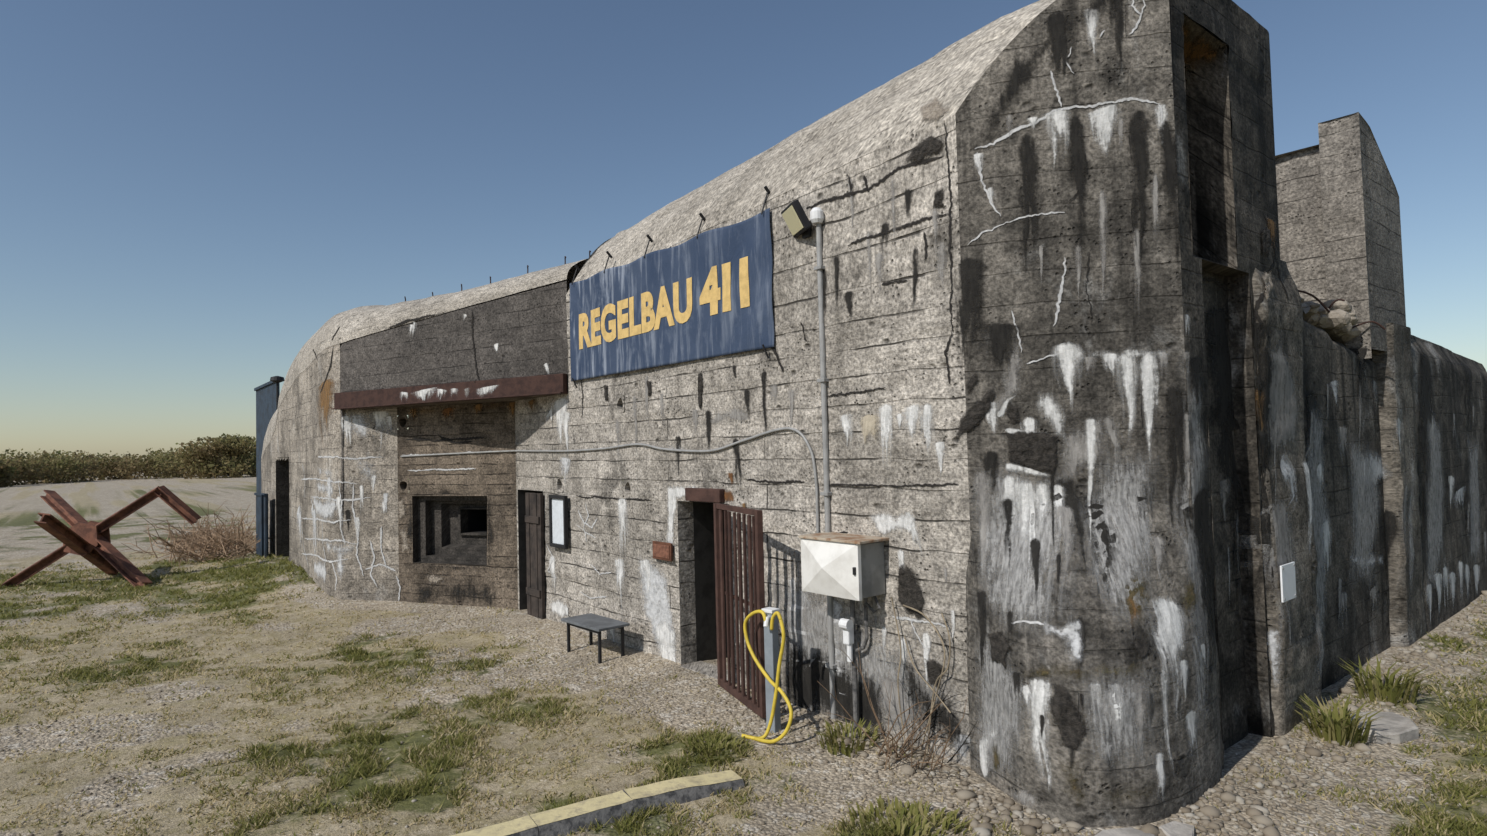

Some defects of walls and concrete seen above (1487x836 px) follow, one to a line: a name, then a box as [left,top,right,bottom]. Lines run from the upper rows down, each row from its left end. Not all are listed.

damp [848,179,911,288]
crack [806,0,1164,384]
damp [992,0,1181,294]
rust [319,379,334,439]
damp [772,208,1487,793]
damp [1014,790,1034,804]